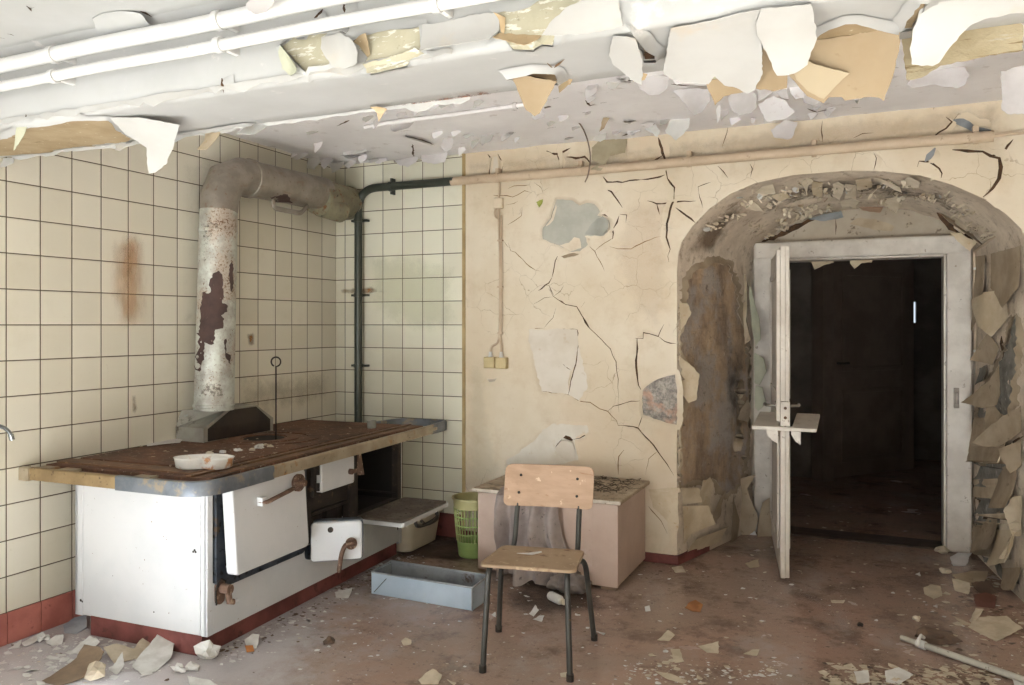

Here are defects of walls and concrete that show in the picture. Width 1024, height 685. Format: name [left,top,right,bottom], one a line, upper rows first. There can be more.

peeling [0,0,1024,174]
crack [342,136,432,162]
peeling [536,196,615,258]
crack [547,120,753,269]
crack [762,219,837,242]
crack [937,213,977,244]
crack [917,111,1018,208]
peeling [503,420,592,467]
peeling [525,325,591,401]
crack [487,110,681,528]
flaking render [638,256,772,552]
peeling [703,176,1024,584]